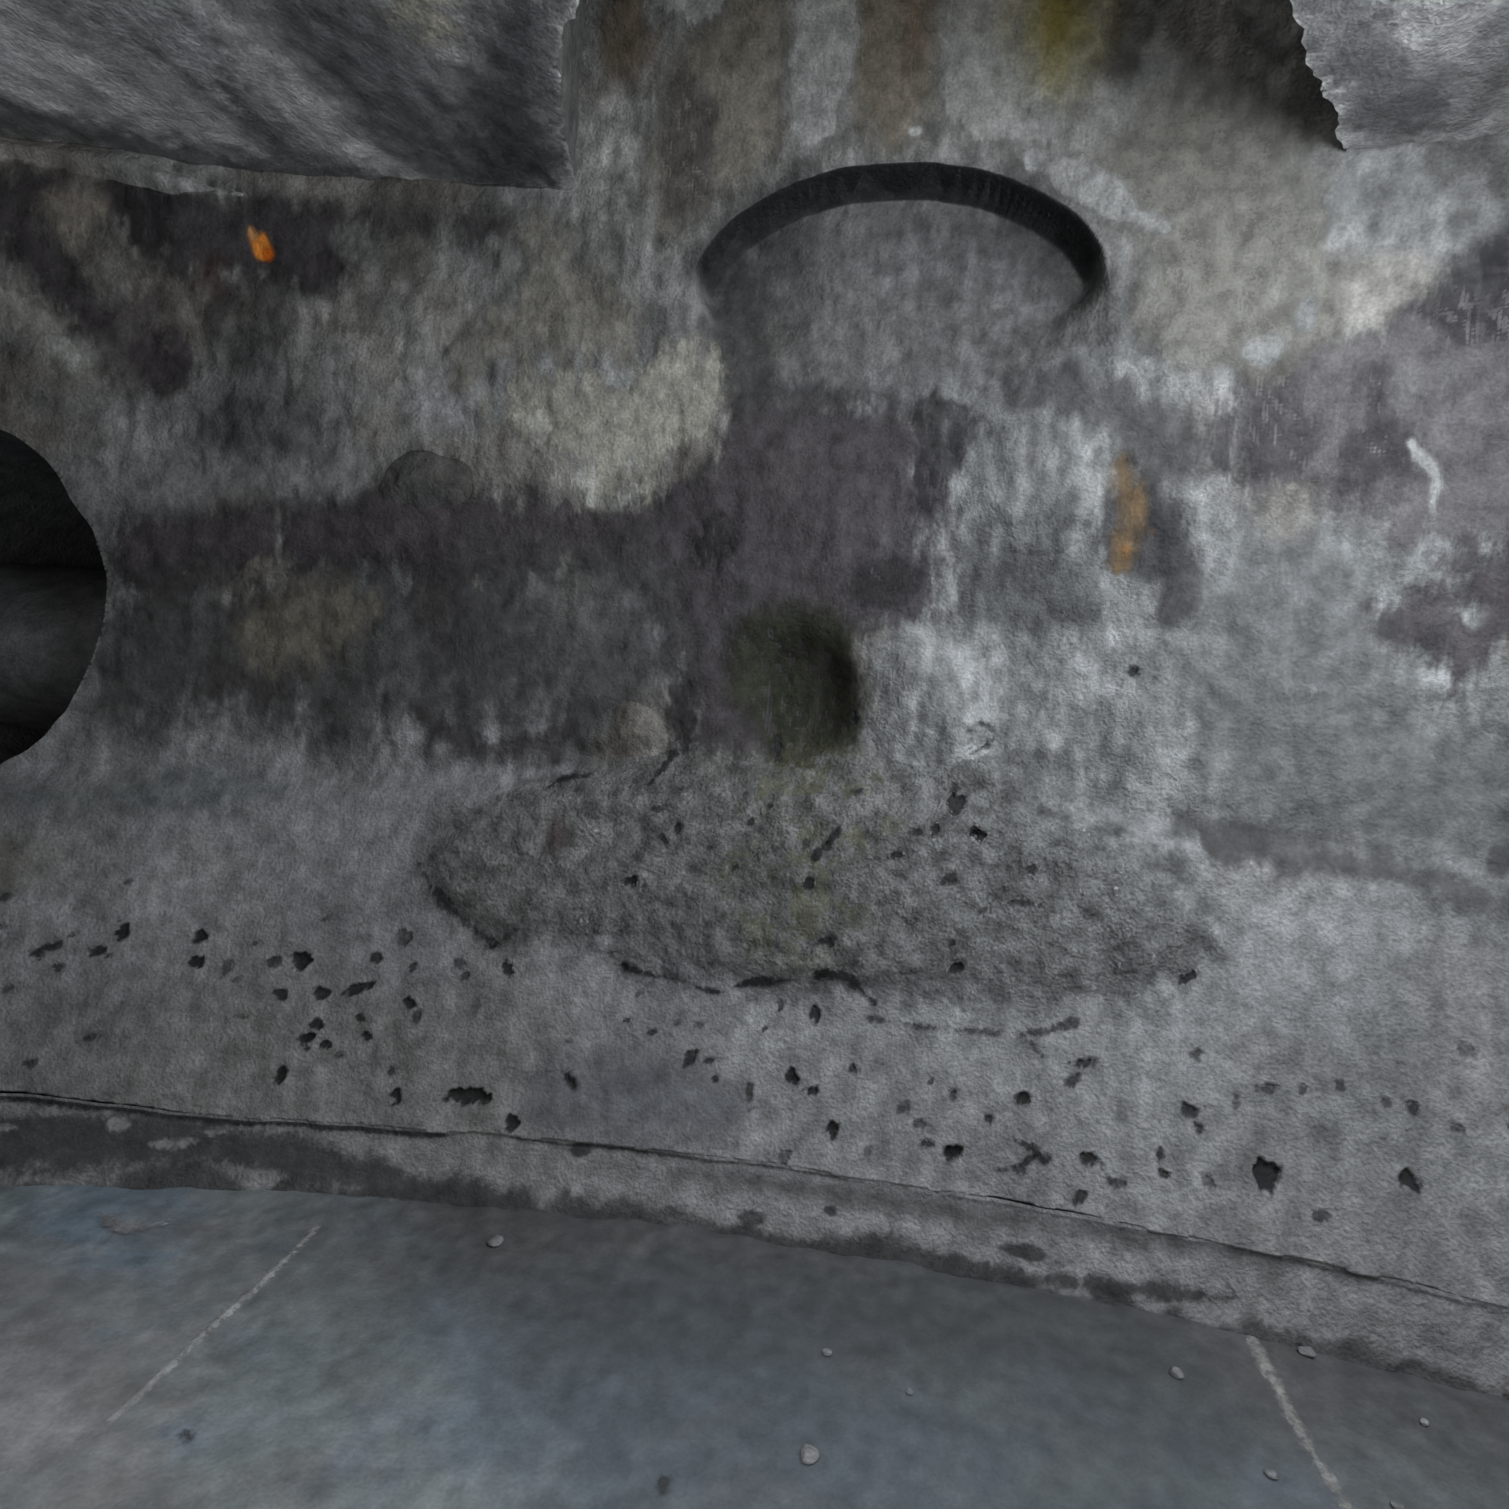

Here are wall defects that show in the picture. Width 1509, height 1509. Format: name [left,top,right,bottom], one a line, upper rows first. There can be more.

corrosion [248,228,273,260]
leakage [1007,250,1509,912]
spalling [188,929,207,969]
spalling [267,952,313,972]
spalling [313,981,374,1000]
spalling [297,1019,343,1058]
spalling [785,1066,819,1095]
spalling [443,1088,491,1107]
spalling [1014,1092,1031,1104]
spalling [896,1103,963,1161]
spalling [1253,1158,1282,1194]
spalling [1399,1170,1423,1193]